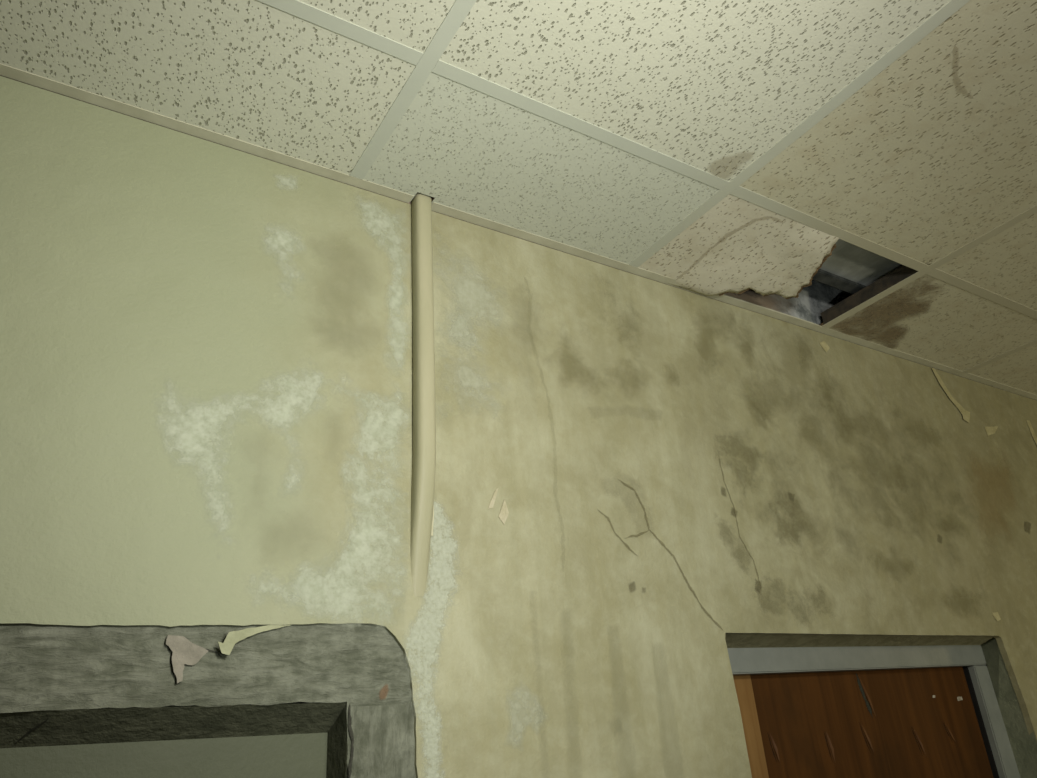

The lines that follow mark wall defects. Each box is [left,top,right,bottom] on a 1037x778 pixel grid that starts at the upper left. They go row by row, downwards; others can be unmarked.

water stain [361,204,406,360]
water stain [833,287,932,348]
water stain [166,375,321,529]
water stain [261,395,408,616]
flaking render [0,624,416,778]
water stain [407,502,457,778]